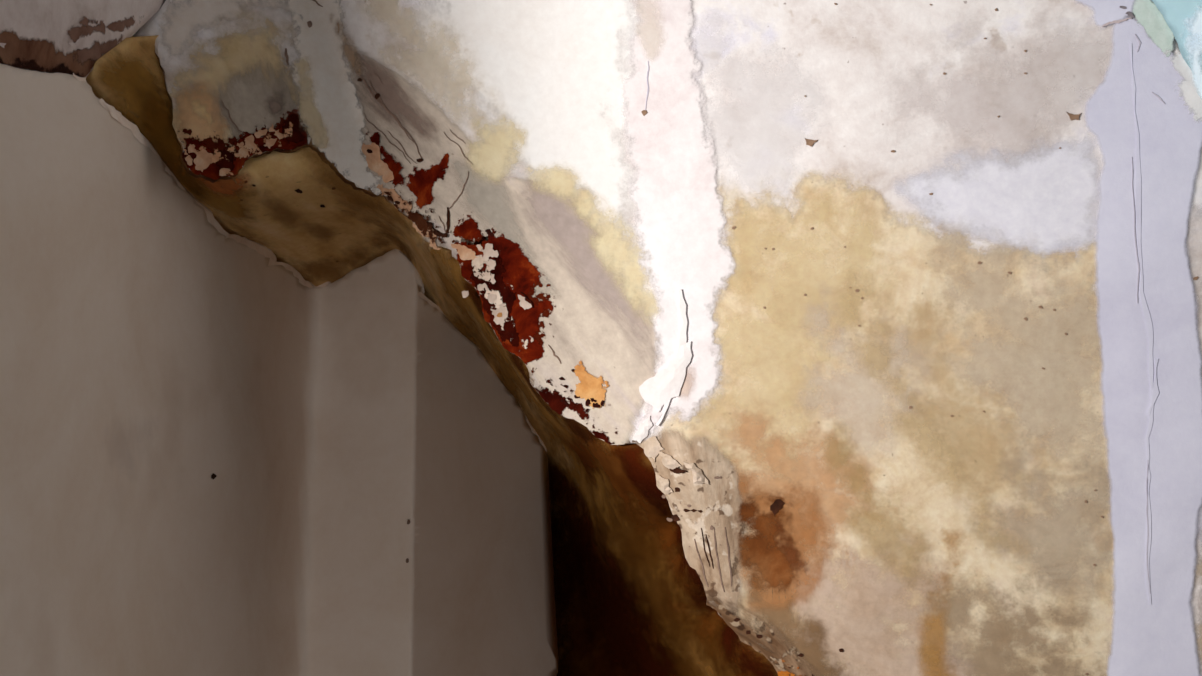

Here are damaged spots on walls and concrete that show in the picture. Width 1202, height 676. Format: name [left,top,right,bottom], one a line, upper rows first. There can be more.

spalling [99,98,331,288]
corrosion [178,102,311,195]
damp [99,18,411,262]
flaking render [219,66,297,153]
corrosion [361,132,449,209]
corrosion [451,215,618,445]
flaking render [351,53,843,676]
damp [426,167,1115,676]